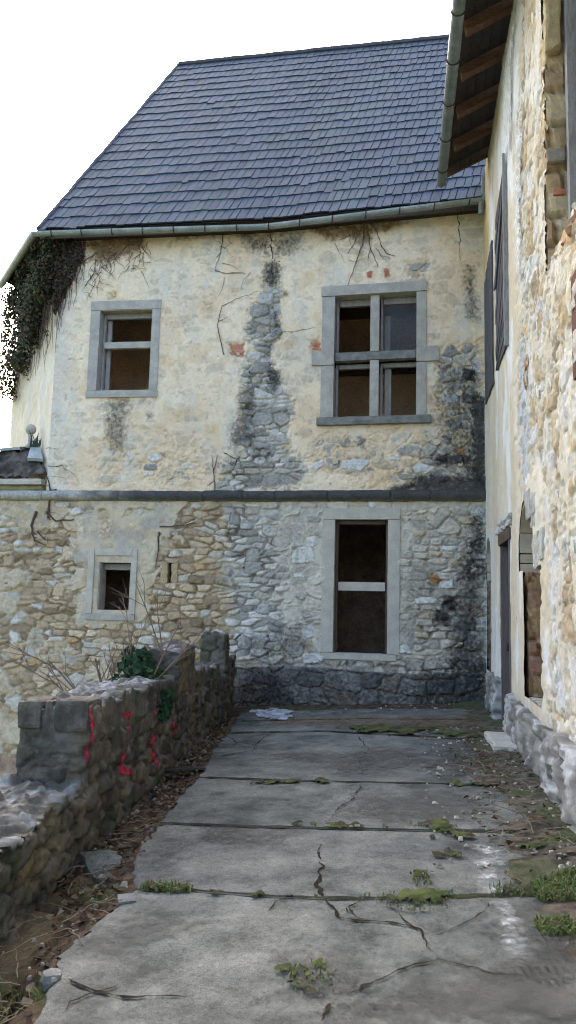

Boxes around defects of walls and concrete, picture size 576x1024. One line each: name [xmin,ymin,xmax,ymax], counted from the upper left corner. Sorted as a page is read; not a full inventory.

water stain [106,399,125,450]
spalling [211,284,490,680]
crack [330,736,387,819]
crack [268,843,537,1021]